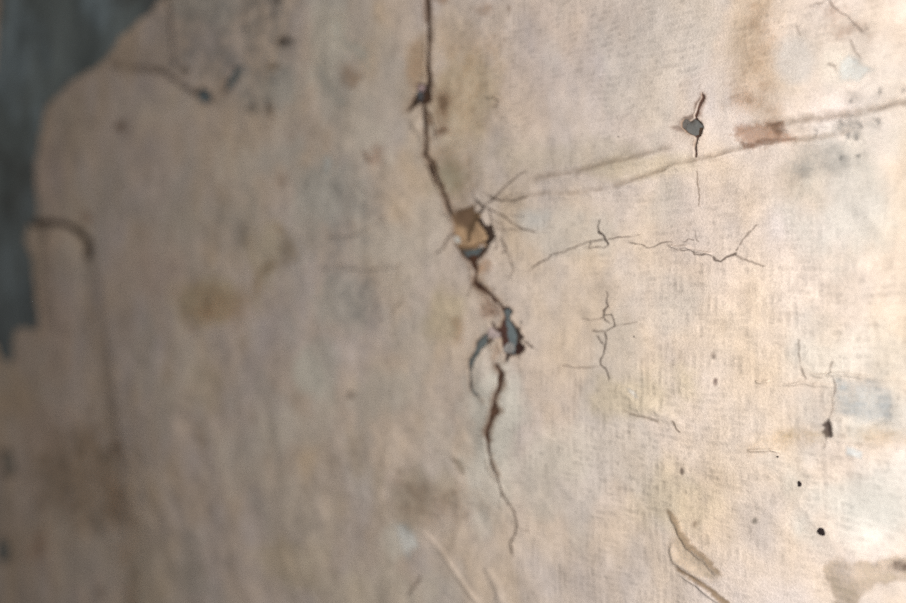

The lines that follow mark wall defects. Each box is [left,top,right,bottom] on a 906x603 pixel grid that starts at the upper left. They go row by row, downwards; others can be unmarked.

peeling [0,0,157,364]
crack [419,0,455,253]
crack [467,172,535,310]
crack [533,220,644,267]
crack [598,293,615,378]
crack [485,364,517,555]
crack [823,421,832,437]
peeling [668,511,718,574]